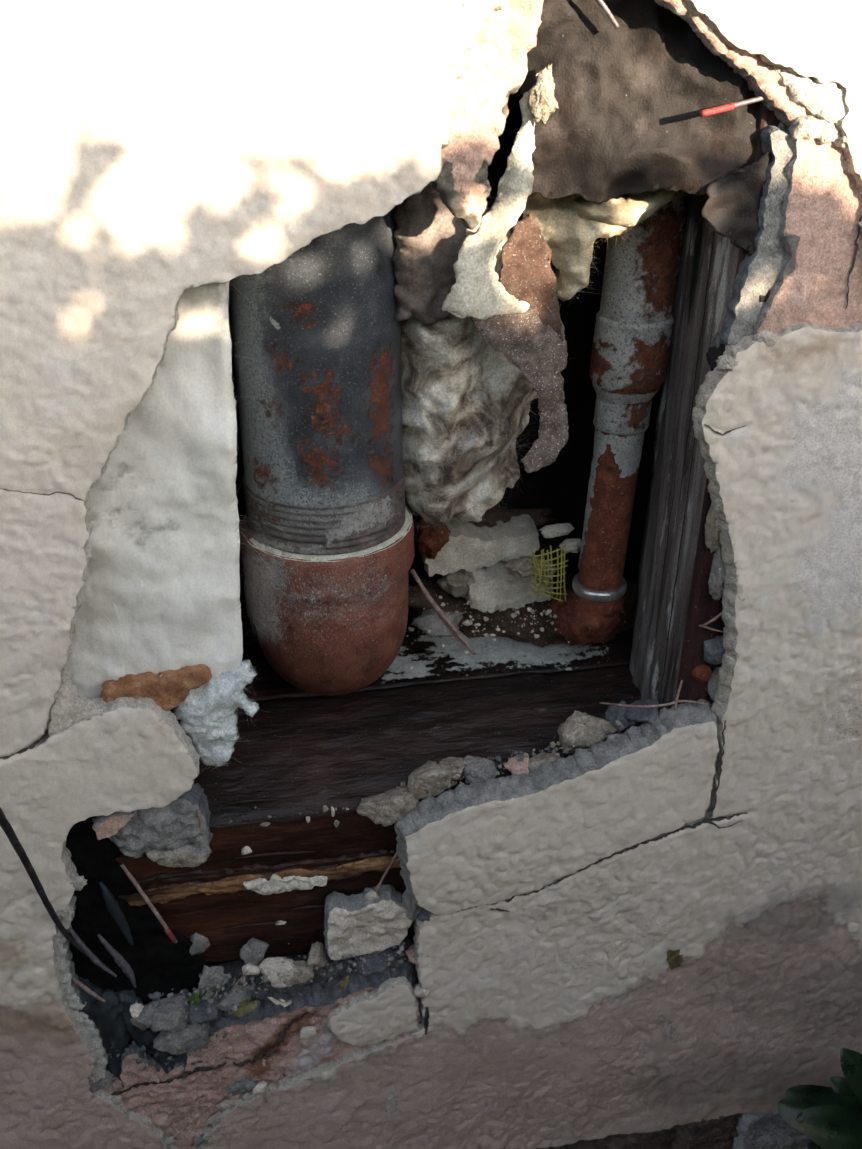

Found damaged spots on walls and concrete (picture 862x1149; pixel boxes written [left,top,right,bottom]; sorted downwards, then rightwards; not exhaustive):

spalling [408,0,544,230]
crack [0,488,83,501]
spalling [36,274,252,785]
rust [267,344,394,493]
rust [589,196,687,431]
spalling [517,0,862,896]
peeling [382,631,612,684]
crack [458,721,747,912]
spalling [52,824,439,1149]